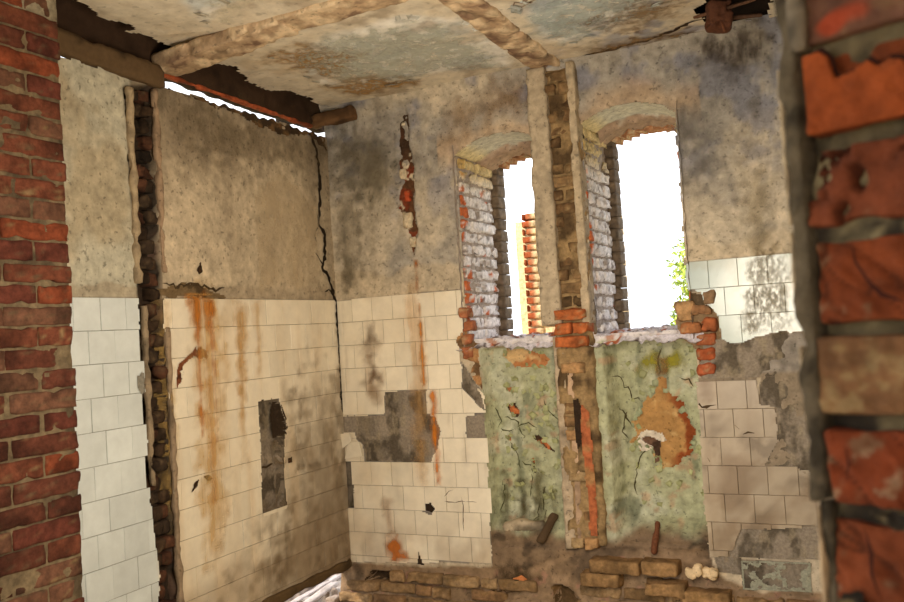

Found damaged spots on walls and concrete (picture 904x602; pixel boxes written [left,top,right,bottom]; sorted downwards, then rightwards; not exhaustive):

damp [268,44,349,76]
damp [330,78,415,95]
flaking render [399,115,418,255]
crack [311,139,343,412]
rust [187,293,219,397]
peeling [258,400,288,514]
peeling [343,389,441,463]
peeling [629,370,702,489]
peeling [673,289,811,470]
peeling [715,527,820,592]